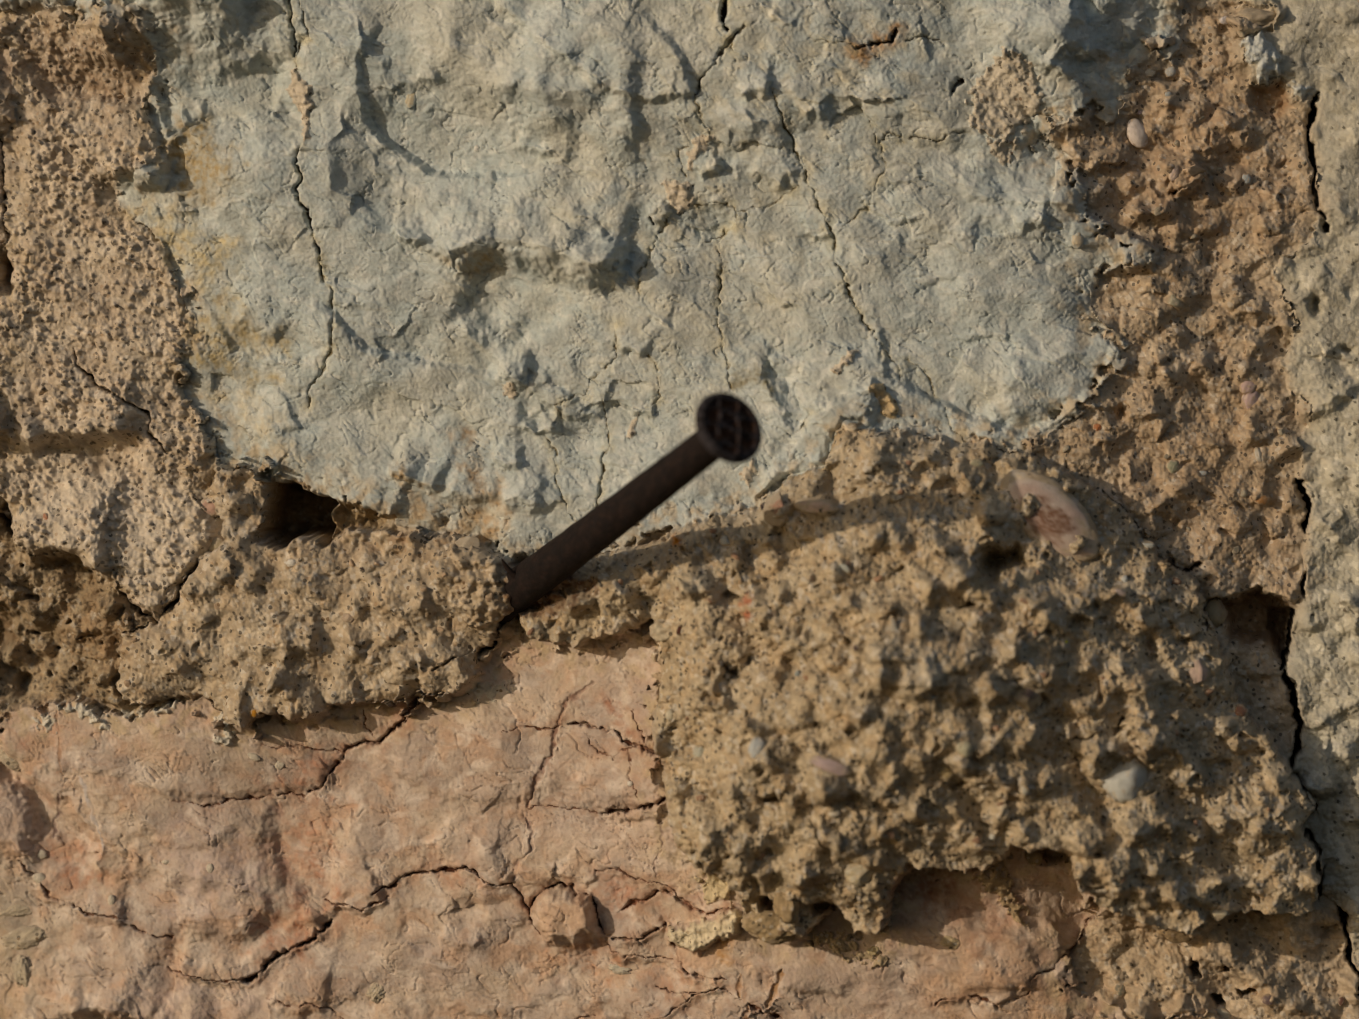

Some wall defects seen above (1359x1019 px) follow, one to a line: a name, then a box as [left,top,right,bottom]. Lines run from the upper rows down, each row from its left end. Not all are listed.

crack [1306,92,1330,233]
crack [636,0,968,443]
crack [1296,479,1312,533]
corrosion [491,551,602,627]
peeling [32,713,58,734]
peeling [117,698,181,722]
crack [168,613,510,808]
crack [502,710,666,817]
crack [1280,568,1359,996]
crack [19,861,783,1019]
peeling [694,872,735,906]
peeling [976,859,1031,932]